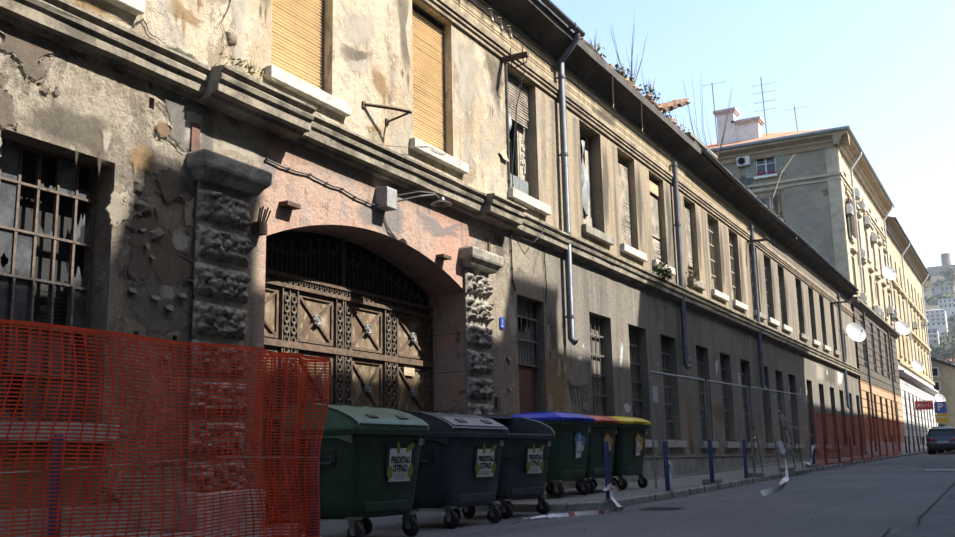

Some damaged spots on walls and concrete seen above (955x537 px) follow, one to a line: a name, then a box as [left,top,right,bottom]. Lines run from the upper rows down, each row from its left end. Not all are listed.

crack [132,0,181,54]
peeling [106,190,133,227]